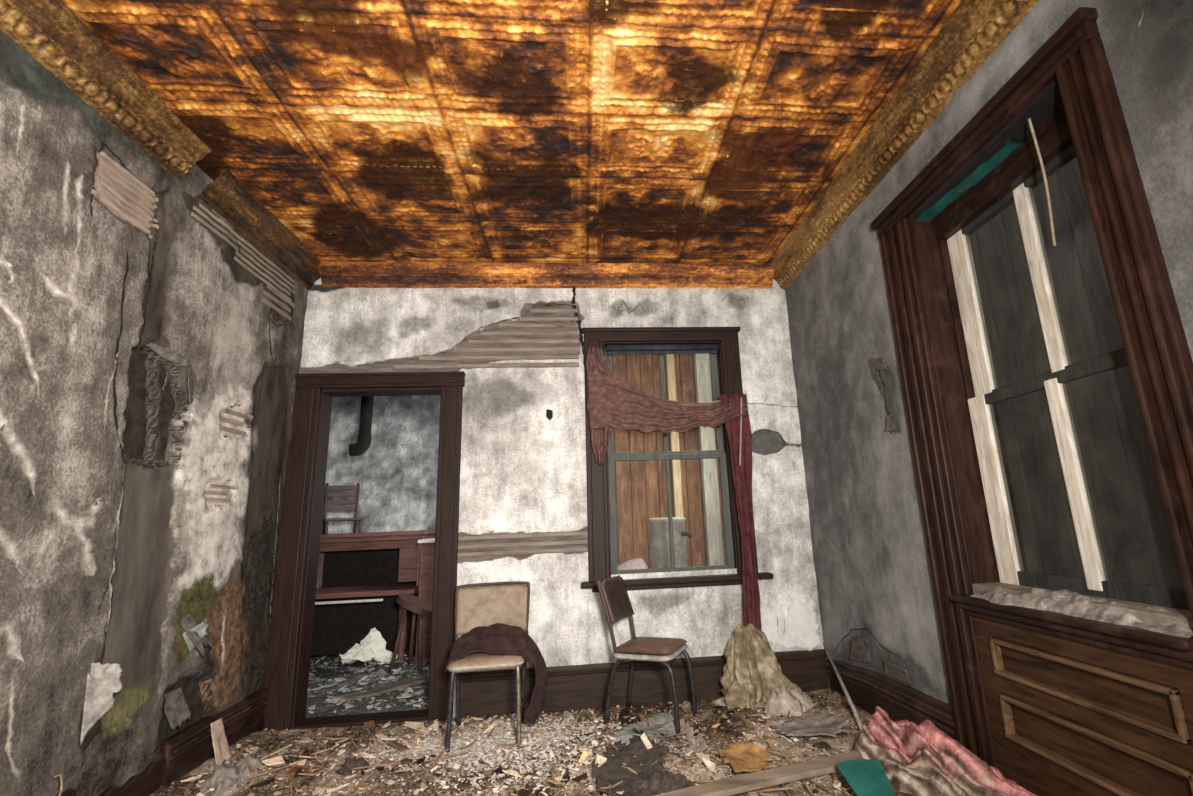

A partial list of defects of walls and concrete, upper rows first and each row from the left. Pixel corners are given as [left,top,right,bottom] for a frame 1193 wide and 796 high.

corrosion [267,0,433,80]
corrosion [819,0,891,40]
damp [0,29,169,174]
corrosion [658,63,737,114]
corrosion [351,140,452,200]
corrosion [586,127,801,243]
damp [43,161,83,360]
damp [0,299,39,393]
spalling [299,301,584,373]
spalling [80,339,252,752]
damp [241,362,293,696]
spalling [457,527,588,563]